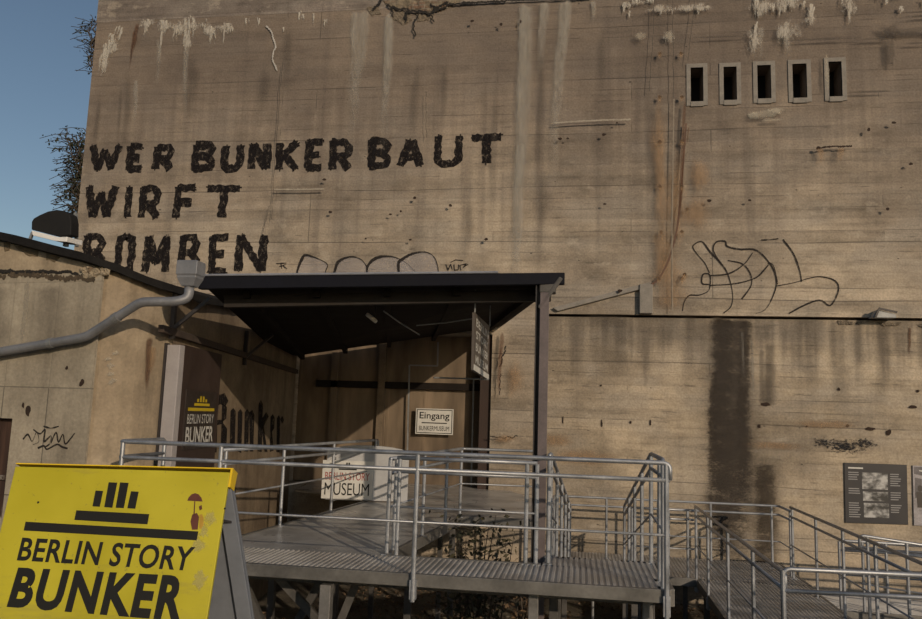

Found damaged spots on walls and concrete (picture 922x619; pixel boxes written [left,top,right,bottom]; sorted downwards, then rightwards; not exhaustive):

water stain [99,26,123,69]
water stain [141,15,233,47]
spalling [367,0,461,25]
water stain [622,0,710,17]
water stain [750,0,815,51]
water stain [778,23,848,41]
rust [652,98,689,284]
water stain [709,319,775,563]